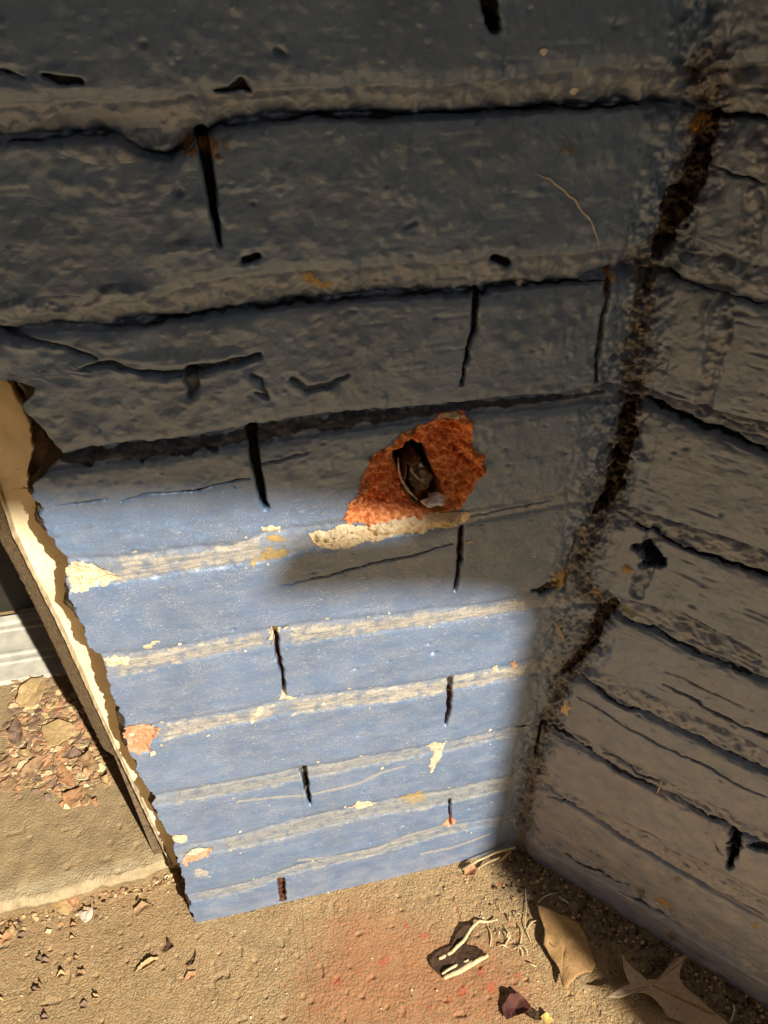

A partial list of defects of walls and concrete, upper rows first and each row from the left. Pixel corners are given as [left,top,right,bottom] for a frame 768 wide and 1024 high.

crack [652,107,768,304]
crack [60,271,768,513]
spalling [308,410,487,550]
peeling [65,525,281,593]
crack [271,627,285,693]
peeling [104,599,525,676]
peeling [122,660,528,757]
crack [443,676,451,723]
crack [561,597,759,733]
crack [299,766,311,802]
peeling [174,729,508,805]
peeling [172,777,507,901]